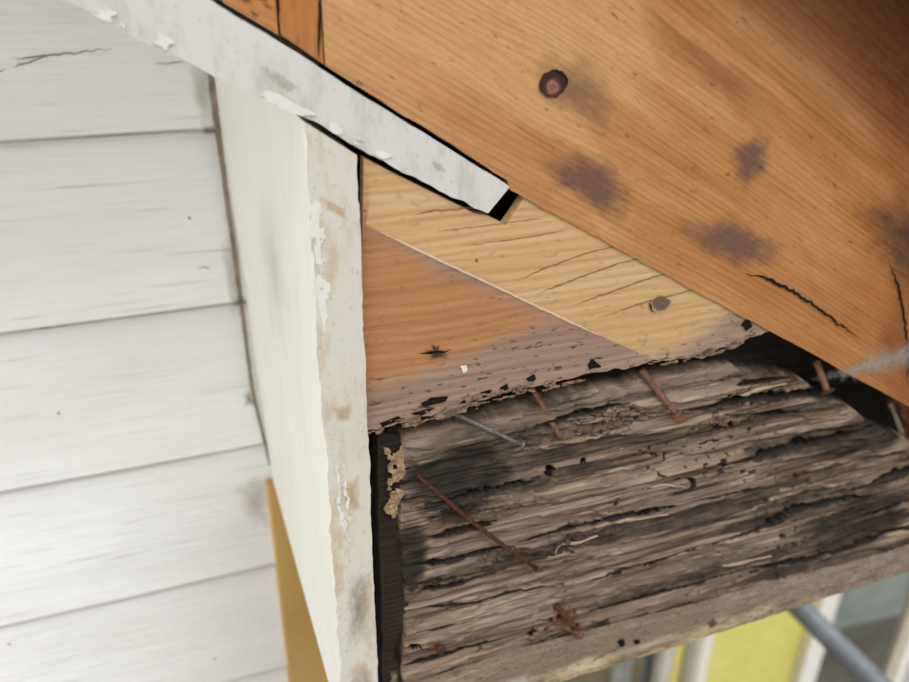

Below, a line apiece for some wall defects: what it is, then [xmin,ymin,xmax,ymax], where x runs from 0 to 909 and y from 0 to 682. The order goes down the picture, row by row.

peeling [93,8,128,30]
crack [0,49,112,72]
peeling [261,90,317,117]
peeling [328,122,343,136]
peeling [373,150,393,160]
peeling [309,201,331,331]
crack [747,273,859,338]
crack [890,265,909,390]
peeling [335,447,353,541]